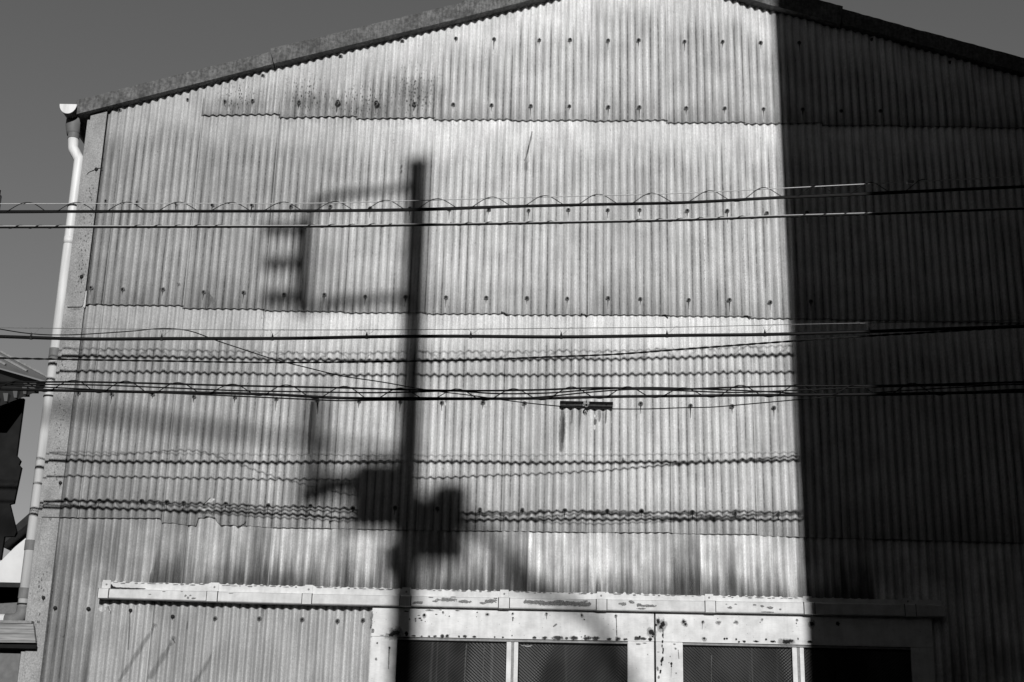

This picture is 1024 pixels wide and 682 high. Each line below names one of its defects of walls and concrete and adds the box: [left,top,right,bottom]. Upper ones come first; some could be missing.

water stain [560,410,607,451]
peeling [515,591,593,607]
rust [533,613,679,679]